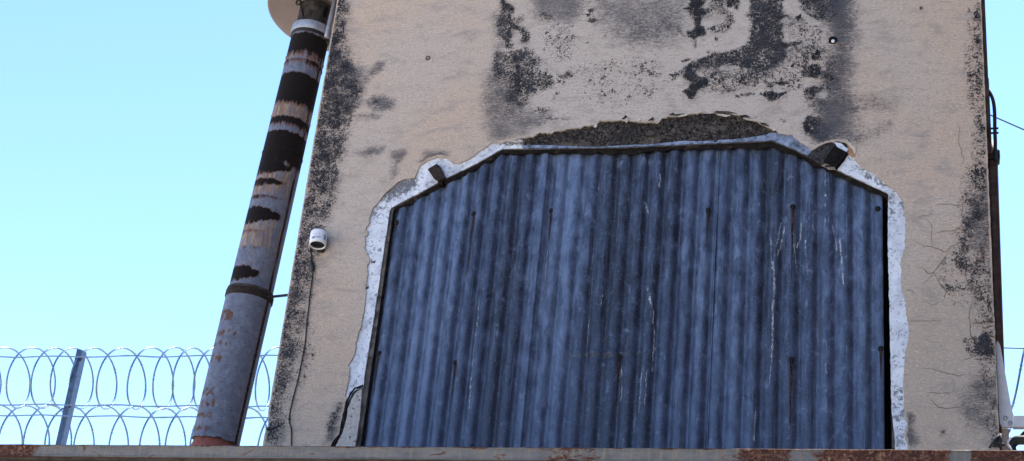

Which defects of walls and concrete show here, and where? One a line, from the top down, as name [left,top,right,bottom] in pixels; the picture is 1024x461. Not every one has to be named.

damp [266,0,393,446]
spalling [336,111,909,450]
damp [485,0,878,142]
crack [906,204,995,409]
damp [940,2,997,442]